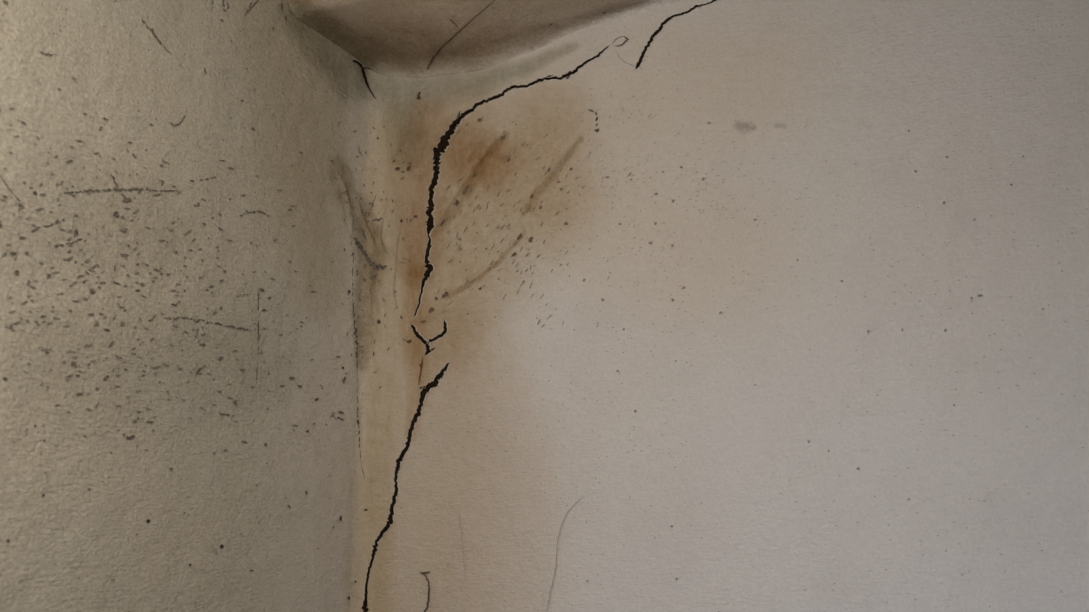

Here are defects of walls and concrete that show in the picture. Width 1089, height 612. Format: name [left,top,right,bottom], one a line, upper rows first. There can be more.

crack [352,60,376,99]
crack [360,0,720,612]